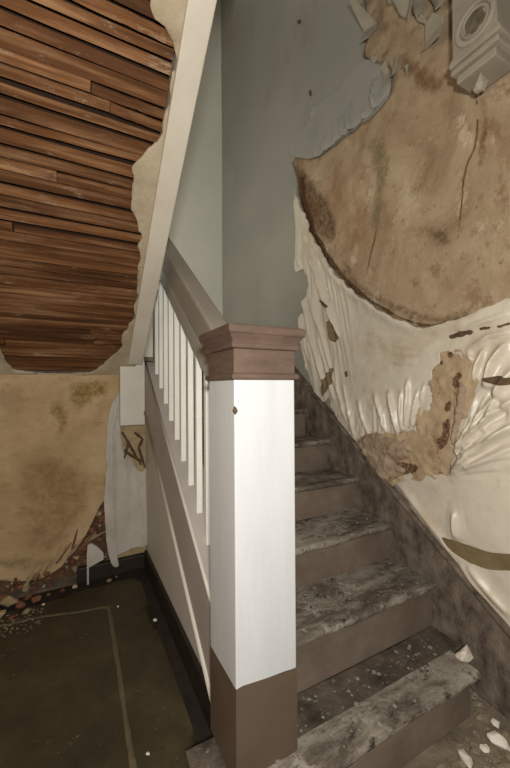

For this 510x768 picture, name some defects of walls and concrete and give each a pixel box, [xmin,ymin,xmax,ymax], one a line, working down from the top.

spalling [0,0,174,92]
spalling [0,142,134,189]
spalling [0,113,136,165]
spalling [0,61,165,144]
crack [457,96,478,239]
spalling [0,181,141,252]
spalling [288,0,510,633]
crack [449,322,510,339]
crack [482,376,510,386]
peeling [0,391,147,600]